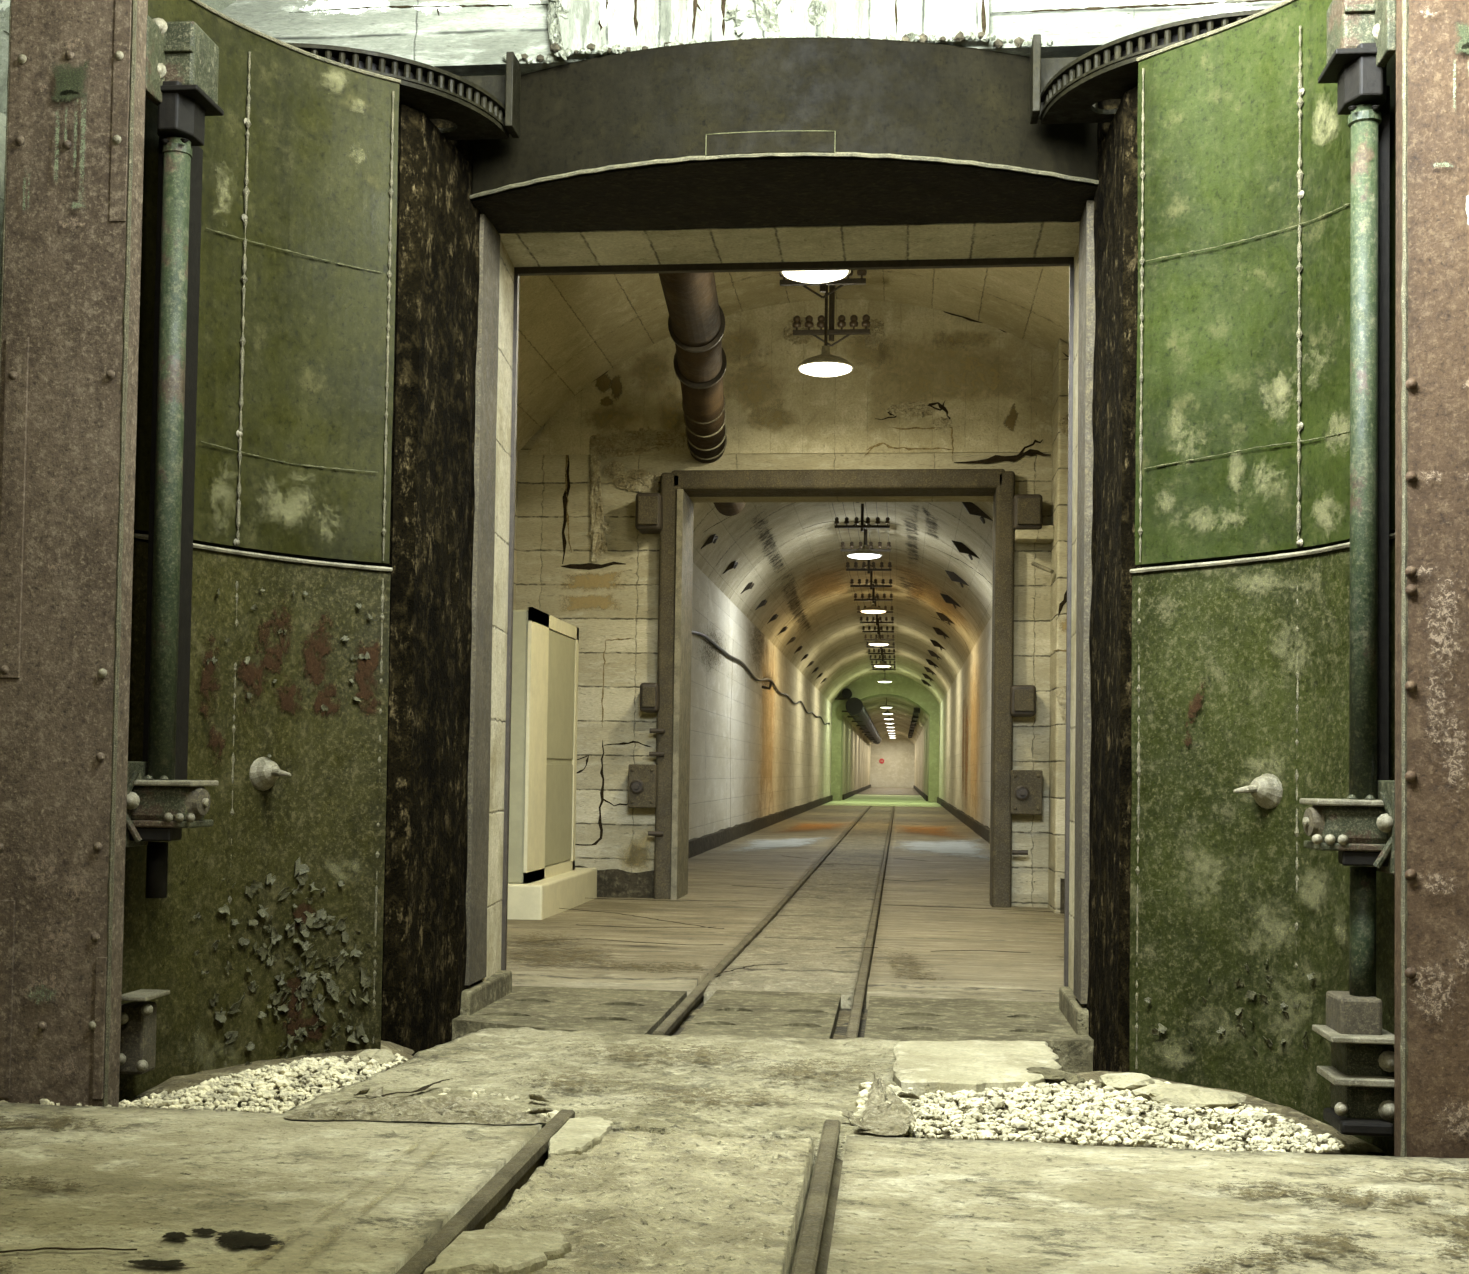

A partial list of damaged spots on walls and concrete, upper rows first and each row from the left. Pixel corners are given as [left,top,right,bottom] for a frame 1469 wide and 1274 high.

spalling [503,0,712,64]
spalling [723,0,832,40]
spalling [852,31,1053,48]
crack [864,401,1051,464]
crack [1054,590,1067,651]
corrosion [236,594,383,718]
crack [575,638,651,846]
peeling [194,857,373,1066]